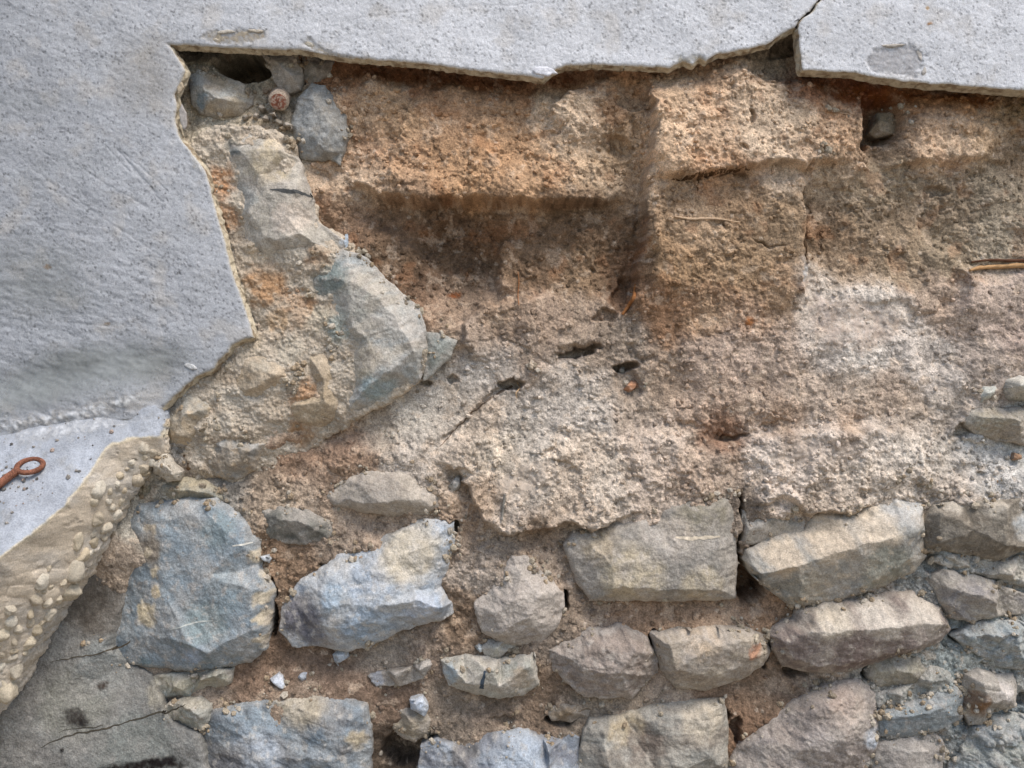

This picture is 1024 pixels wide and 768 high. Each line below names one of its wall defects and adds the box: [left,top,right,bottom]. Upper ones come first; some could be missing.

crack [795,0,820,29]
spalling [869,44,926,76]
flaking render [533,67,558,77]
flaking render [177,82,187,130]
spalling [270,188,313,198]
spalling [333,650,350,666]
spalling [270,671,285,689]
spalling [409,694,429,717]